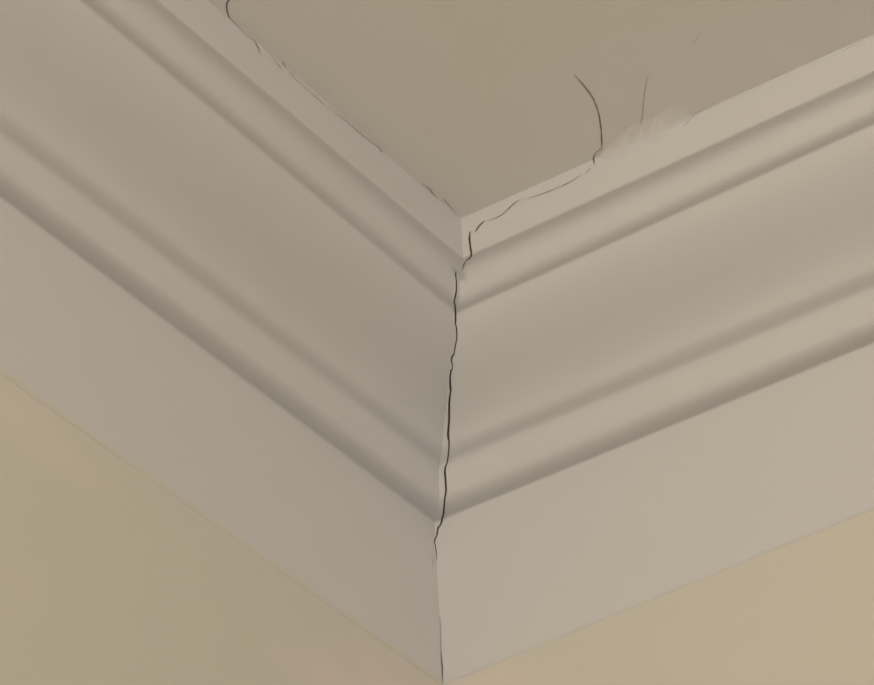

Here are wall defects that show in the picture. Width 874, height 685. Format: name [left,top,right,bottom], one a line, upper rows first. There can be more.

crack [593,113,603,162]
crack [433,202,516,559]